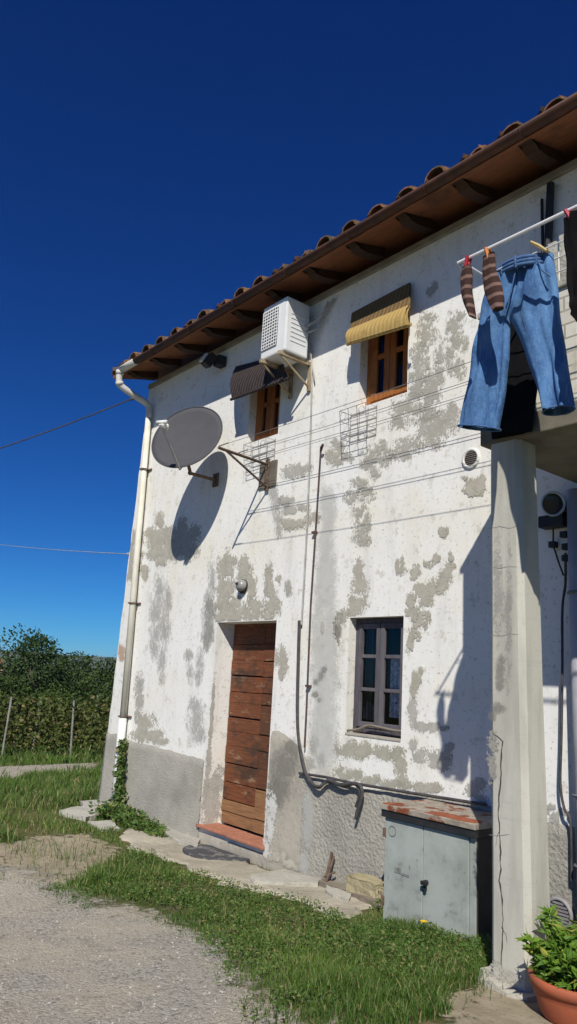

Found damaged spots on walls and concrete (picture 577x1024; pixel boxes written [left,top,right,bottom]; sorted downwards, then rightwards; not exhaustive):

peeling [127,511,205,581]
peeling [280,461,313,480]
peeling [277,494,321,531]
peeling [320,281,469,651]
peeling [461,474,487,497]
peeling [202,547,293,653]
peeling [128,673,169,747]
peeling [332,667,454,794]
crack [489,732,510,968]